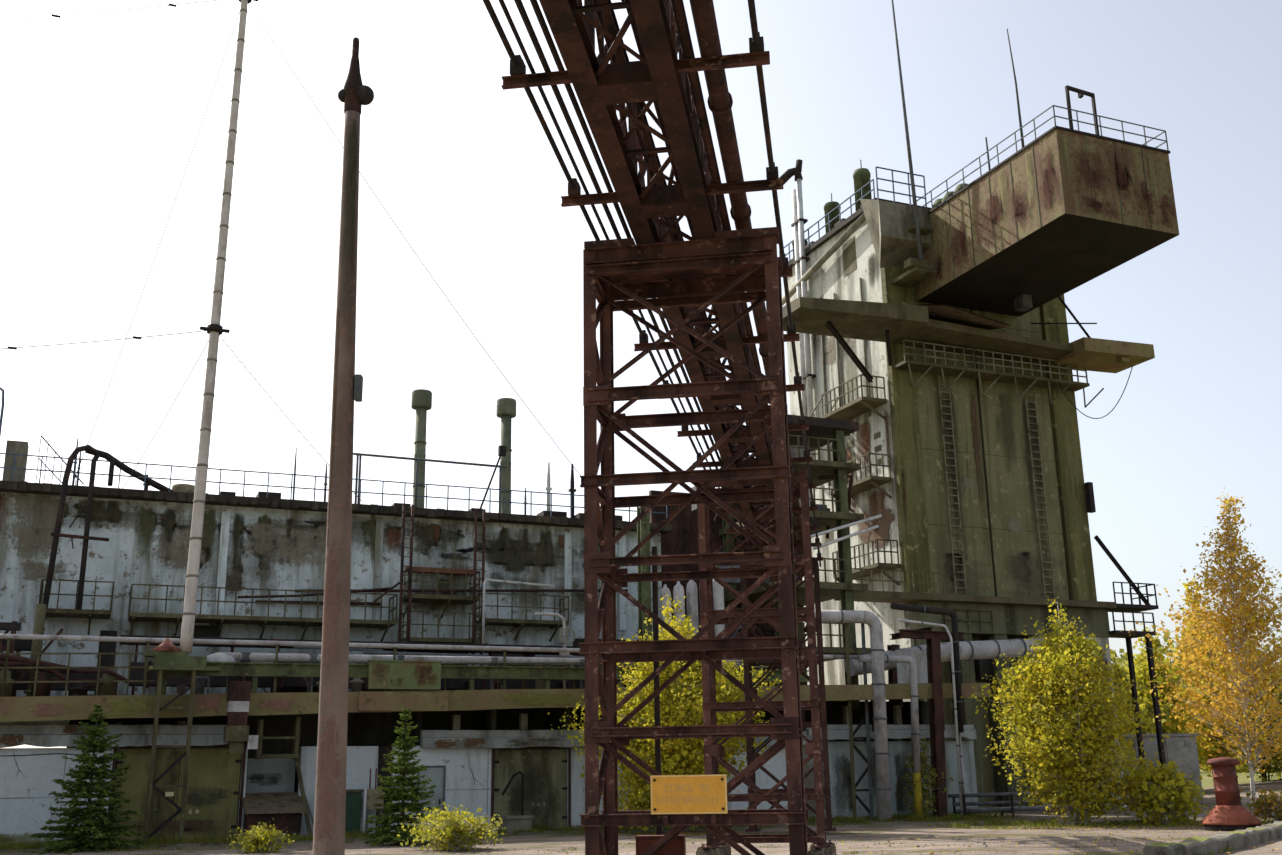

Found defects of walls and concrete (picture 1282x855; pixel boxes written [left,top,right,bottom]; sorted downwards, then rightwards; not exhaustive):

water stain [327,314,339,529]
corrosion [845,423,885,526]
water stain [996,394,1041,495]
water stain [136,508,174,549]
water stain [201,511,216,551]
water stain [232,515,271,553]